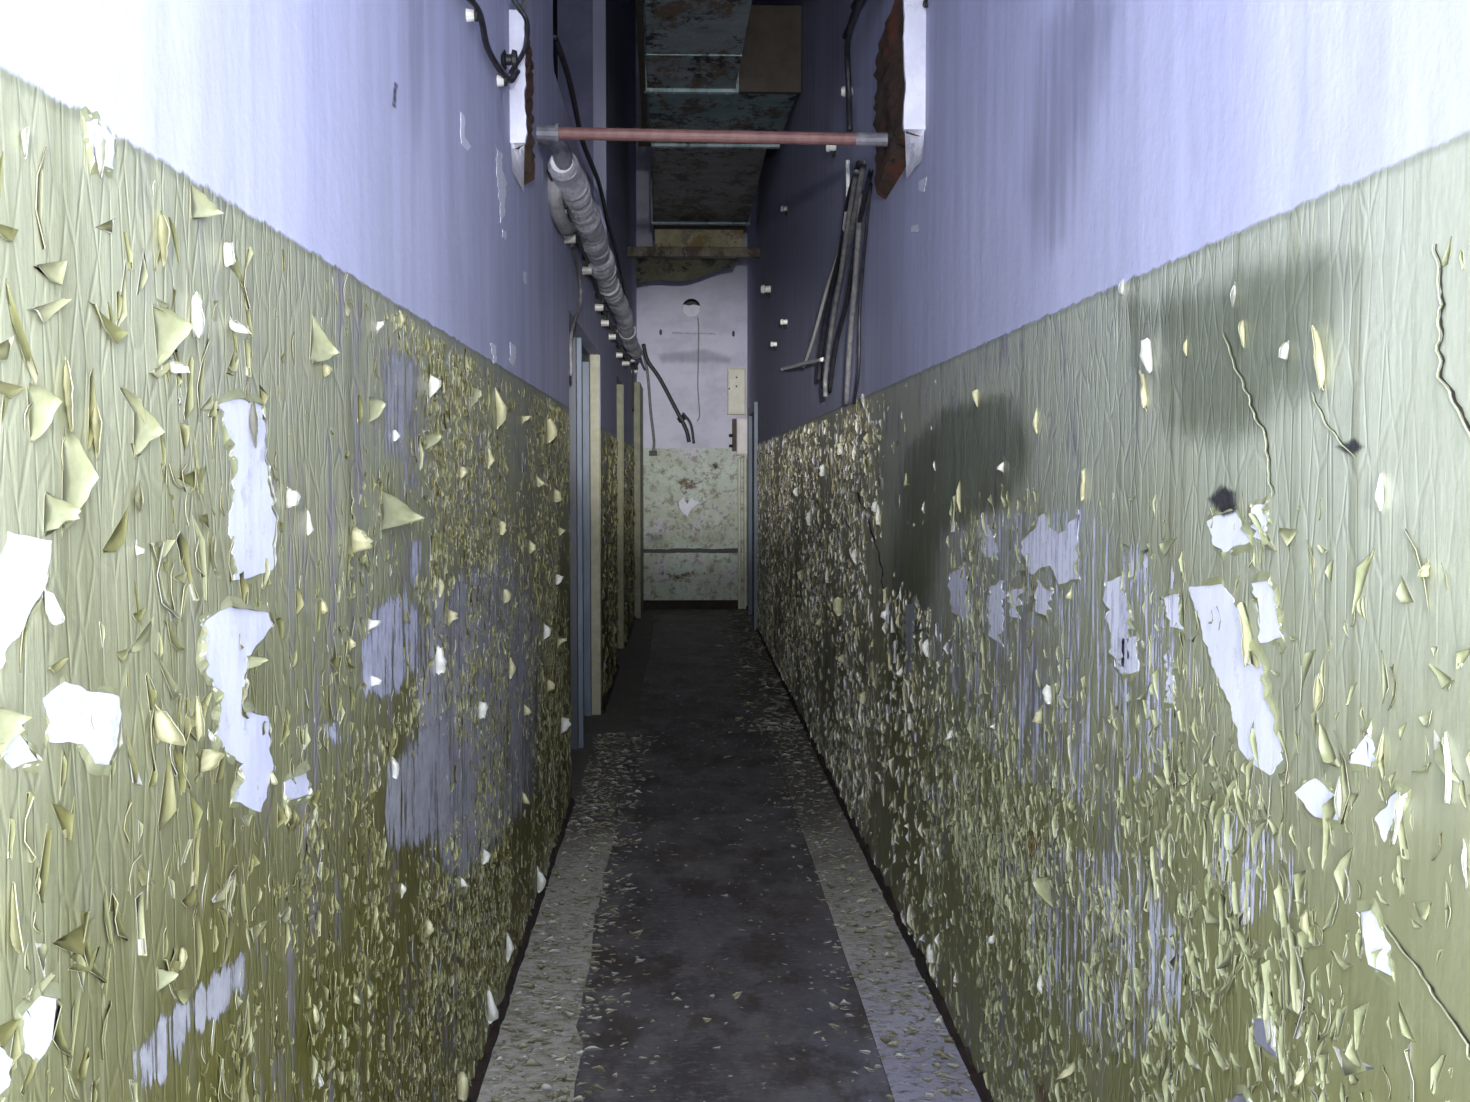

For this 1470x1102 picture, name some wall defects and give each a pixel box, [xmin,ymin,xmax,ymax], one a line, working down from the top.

peeling [460,112,471,151]
peeling [1439,236,1464,269]
peeling [1230,282,1245,349]
peeling [1124,338,1153,413]
peeling [1278,340,1289,361]
peeling [1311,325,1325,391]
damp [1339,440,1361,455]
damp [1209,486,1236,516]
peeling [0,127,572,1102]
peeling [756,389,1470,1102]